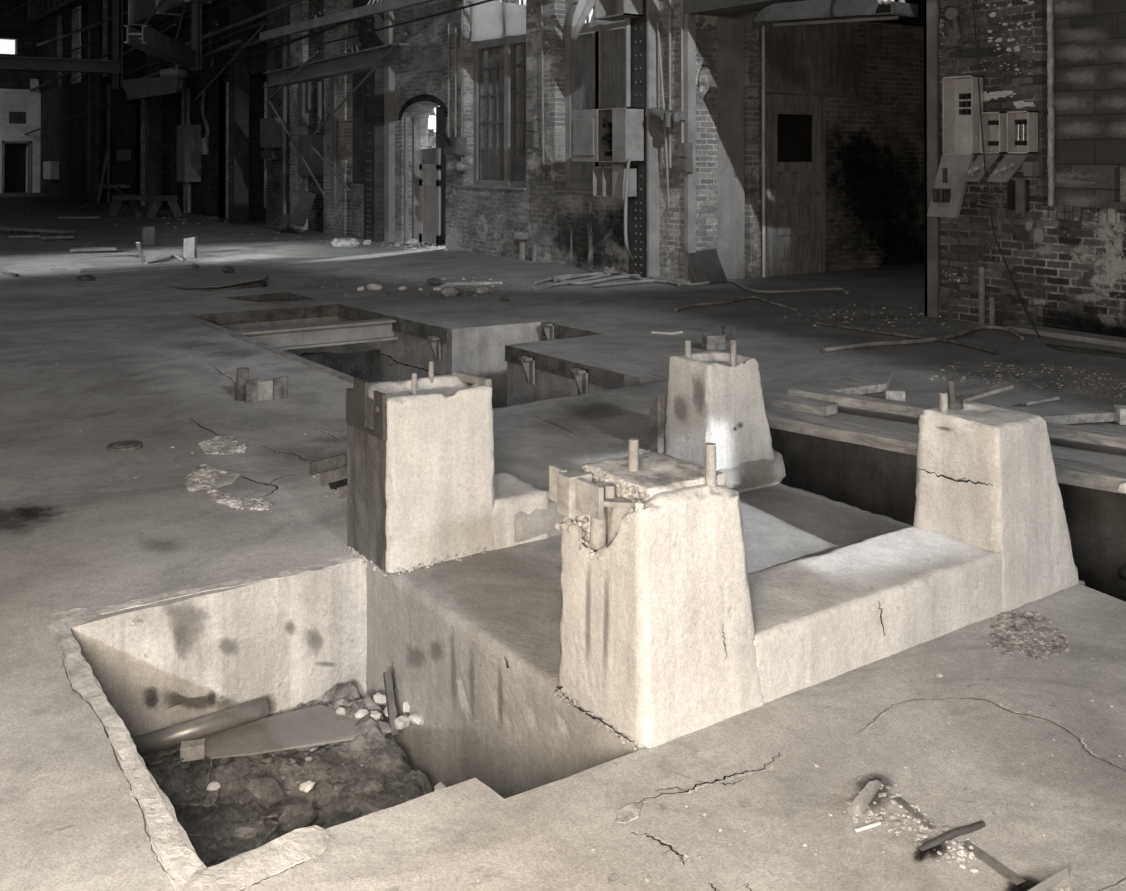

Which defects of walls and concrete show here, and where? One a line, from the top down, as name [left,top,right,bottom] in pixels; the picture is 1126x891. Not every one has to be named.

spalling [184,435,274,510]
crack [917,468,993,487]
leakage [19,507,52,518]
leakage [169,607,199,654]
crack [854,698,1126,771]
crack [636,752,785,803]
crack [240,846,331,891]
crack [631,832,716,891]
crack [1098,878,1126,891]